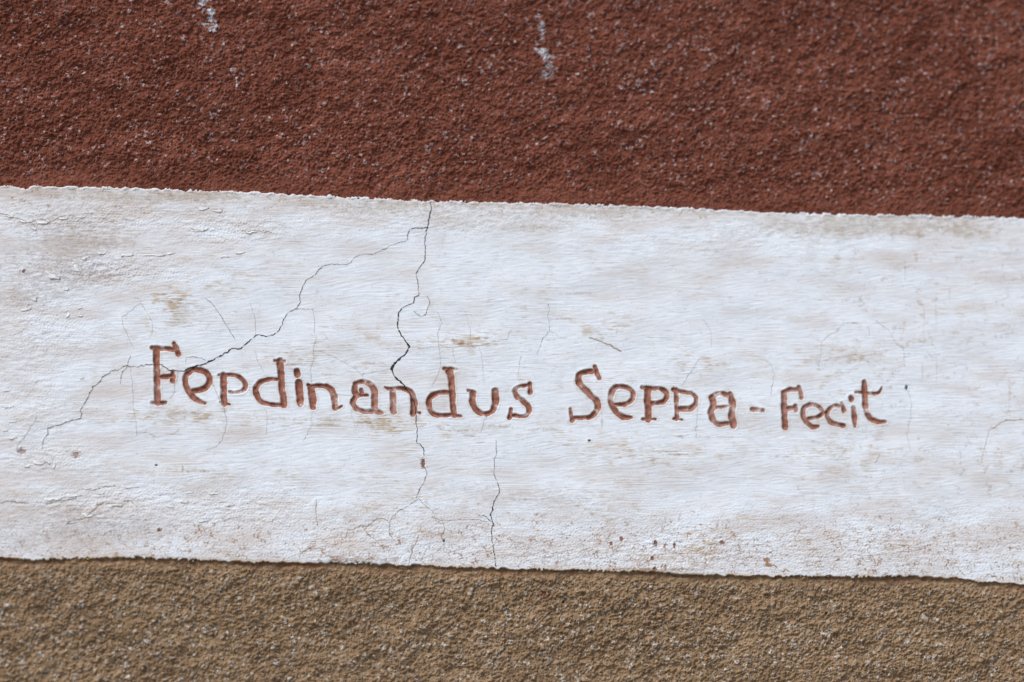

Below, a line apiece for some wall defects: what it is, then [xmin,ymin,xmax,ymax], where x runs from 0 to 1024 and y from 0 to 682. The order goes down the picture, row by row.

crack [0,66,563,680]